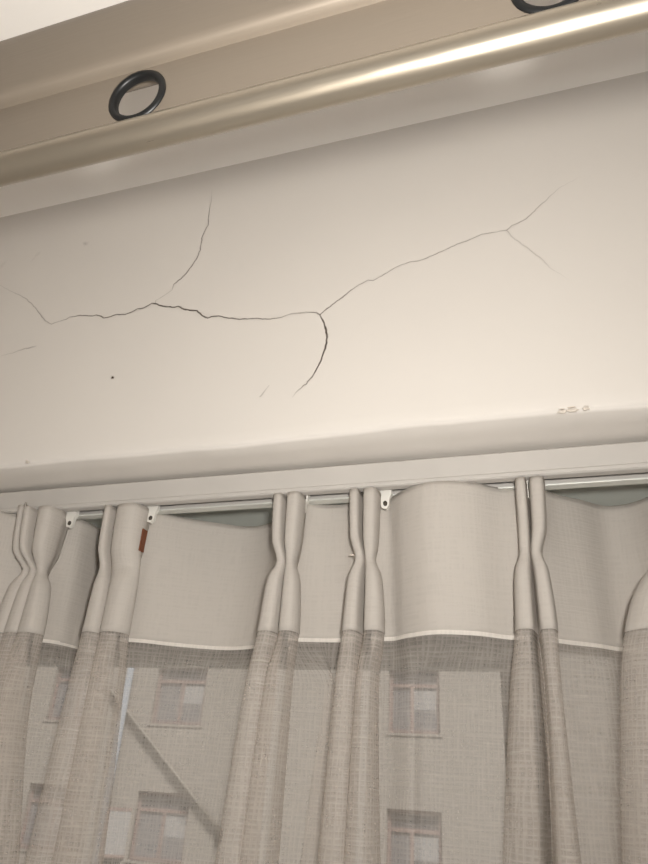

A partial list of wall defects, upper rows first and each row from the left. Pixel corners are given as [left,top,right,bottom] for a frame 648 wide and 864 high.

crack [82,303,261,320]
crack [306,290,351,384]